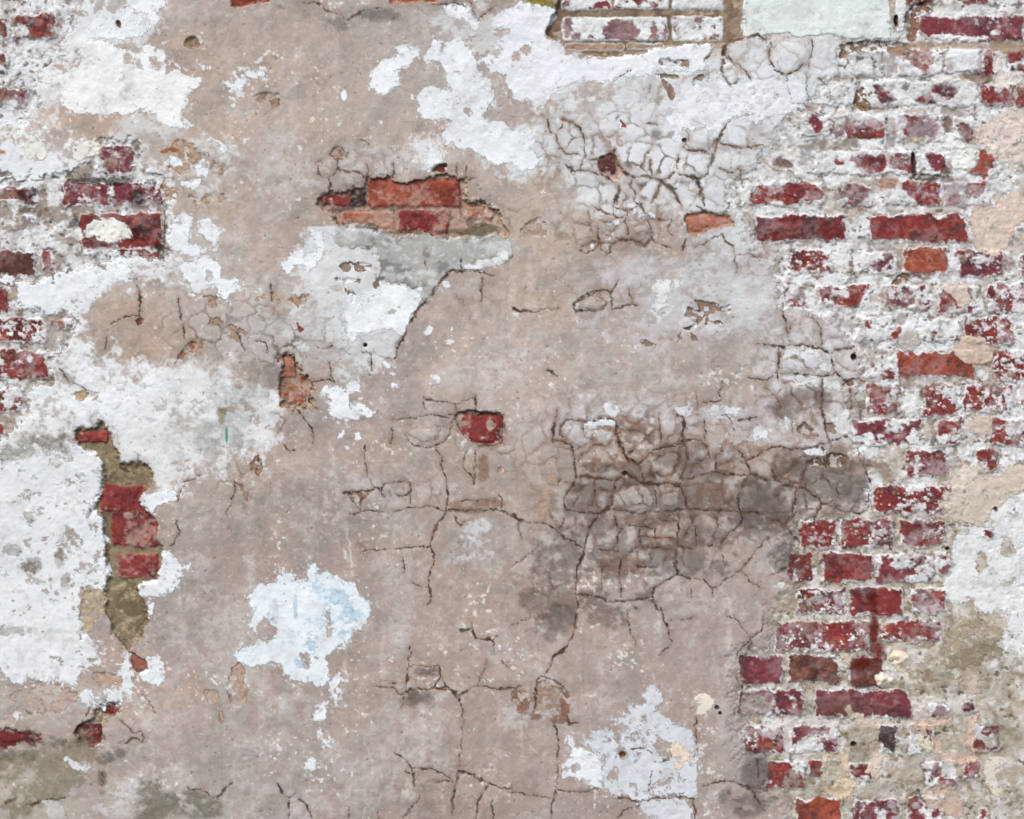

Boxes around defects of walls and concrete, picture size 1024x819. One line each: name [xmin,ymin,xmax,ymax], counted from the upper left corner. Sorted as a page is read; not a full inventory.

peeling [227,70,280,109]
crack [704,33,822,96]
flaking render [0,0,247,441]
crack [547,118,763,264]
flaking render [277,0,1024,819]
leakage [770,388,826,418]
crack [343,303,871,711]
peeling [0,421,191,749]
peeling [64,756,91,773]
crack [396,717,577,816]
crack [597,747,759,819]